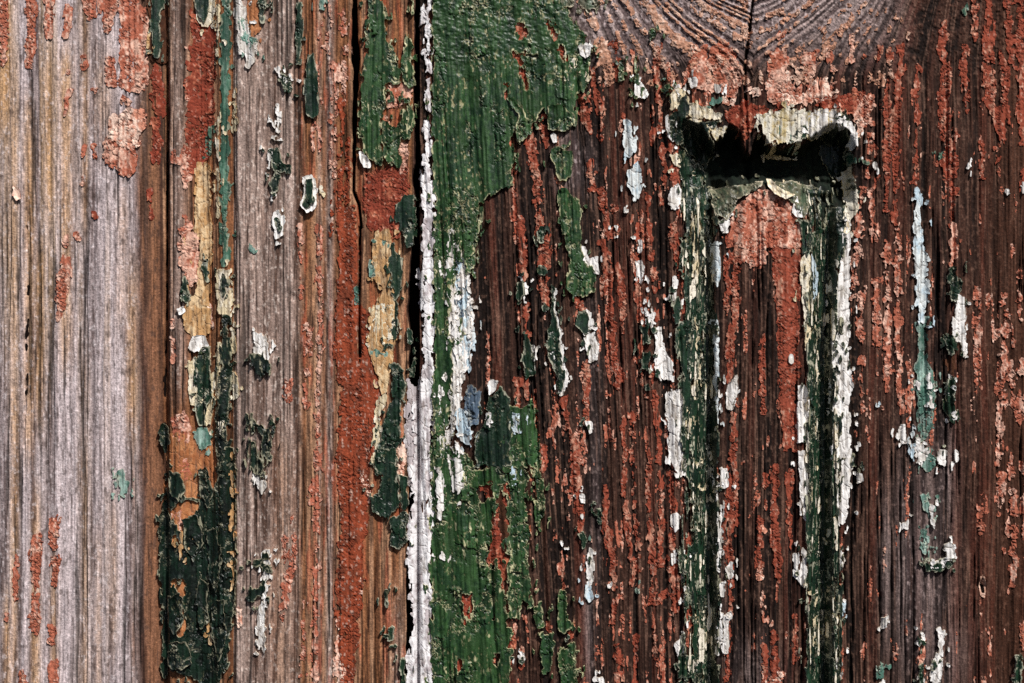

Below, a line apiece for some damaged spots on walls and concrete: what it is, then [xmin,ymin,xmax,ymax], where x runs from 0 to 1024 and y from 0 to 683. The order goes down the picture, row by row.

peeling [0,0,10,67]
peeling [24,0,217,189]
crack [351,0,363,306]
peeling [155,0,960,683]
peeling [936,0,1024,588]
peeling [1011,620,1024,683]